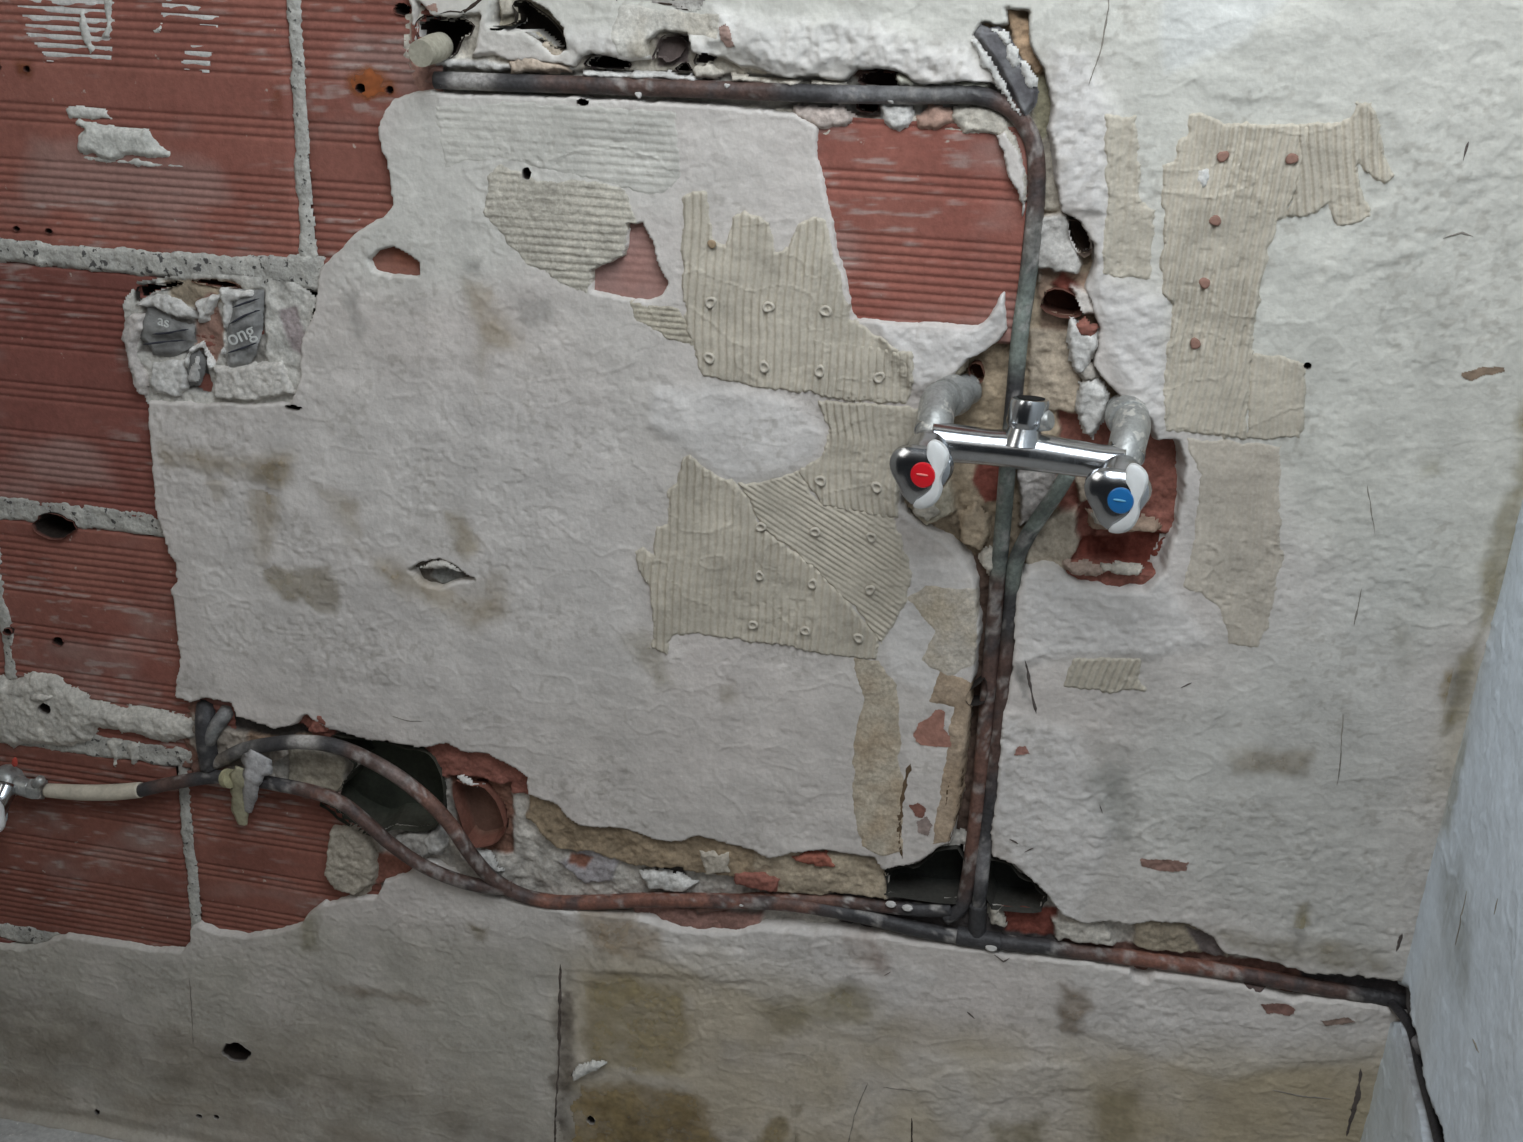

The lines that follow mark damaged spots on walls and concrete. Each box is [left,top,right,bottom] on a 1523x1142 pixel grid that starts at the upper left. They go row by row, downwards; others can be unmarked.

spalling [594,223,668,299]
spalling [793,103,1028,344]
spalling [0,0,444,729]
spalling [308,716,331,733]
spalling [0,727,382,947]
spalling [734,872,780,892]
spalling [792,850,835,867]